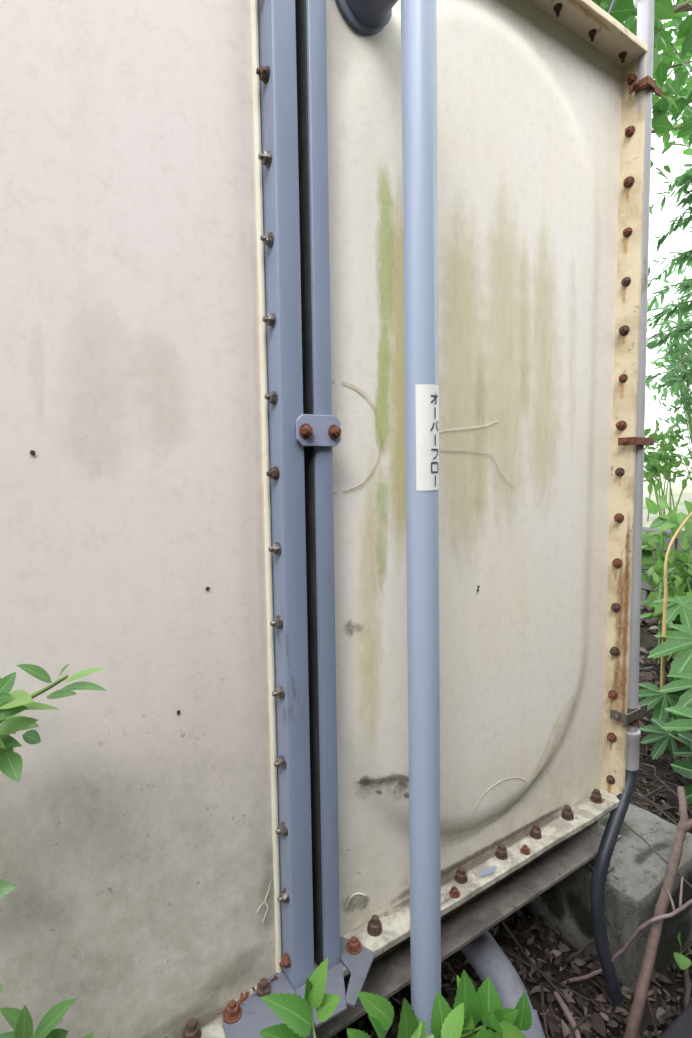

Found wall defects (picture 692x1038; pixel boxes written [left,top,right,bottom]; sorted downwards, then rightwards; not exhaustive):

leakage [376,179,406,517]
rust [611,529,629,713]
leakage [361,775,409,797]